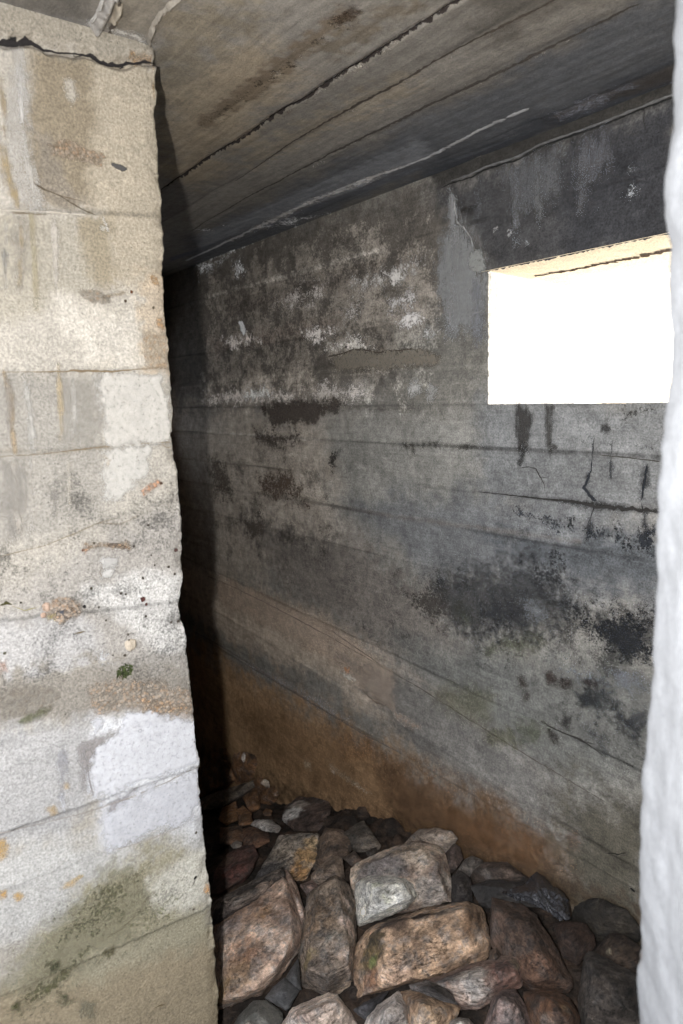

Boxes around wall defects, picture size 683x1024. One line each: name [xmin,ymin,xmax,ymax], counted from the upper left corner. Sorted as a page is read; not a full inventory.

crack [0,36,154,69]
crack [161,0,673,232]
water stain [494,130,613,245]
water stain [196,247,246,278]
water stain [268,274,330,315]
water stain [300,192,491,360]
water stain [220,330,262,351]
water stain [203,377,376,450]
water stain [515,404,532,466]
water stain [545,405,557,454]
crack [482,440,660,538]
water stain [397,549,655,746]